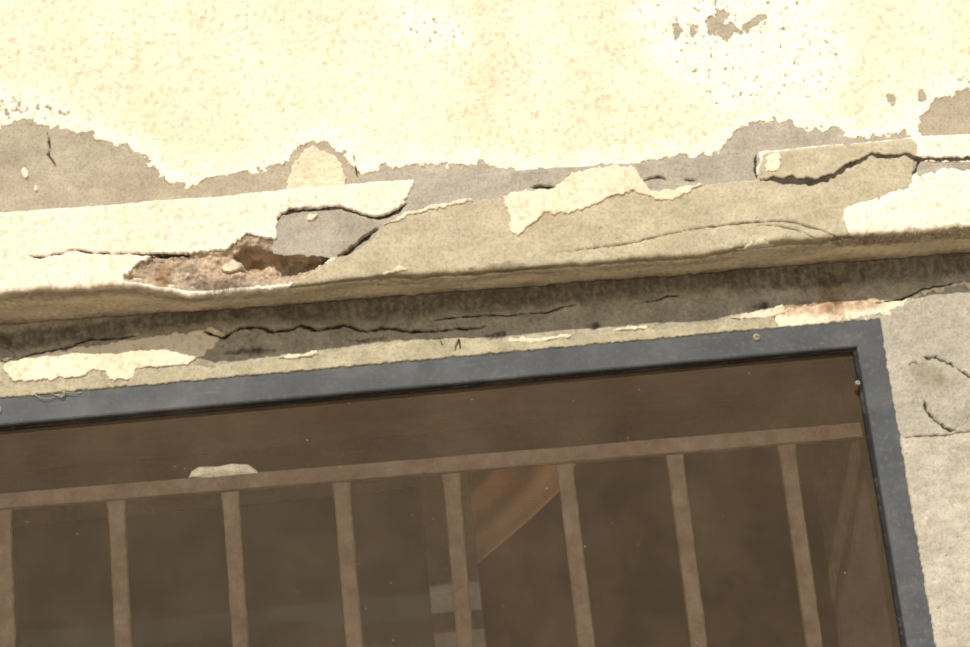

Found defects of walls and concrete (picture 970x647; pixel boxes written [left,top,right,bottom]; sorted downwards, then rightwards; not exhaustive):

flaking render [672,5,767,43]
crack [753,153,970,186]
flaking render [0,88,970,294]
crack [277,204,407,256]
crack [30,250,189,259]
crack [205,305,573,351]
crack [19,336,136,360]
flaking render [0,252,970,647]
crack [906,430,970,438]